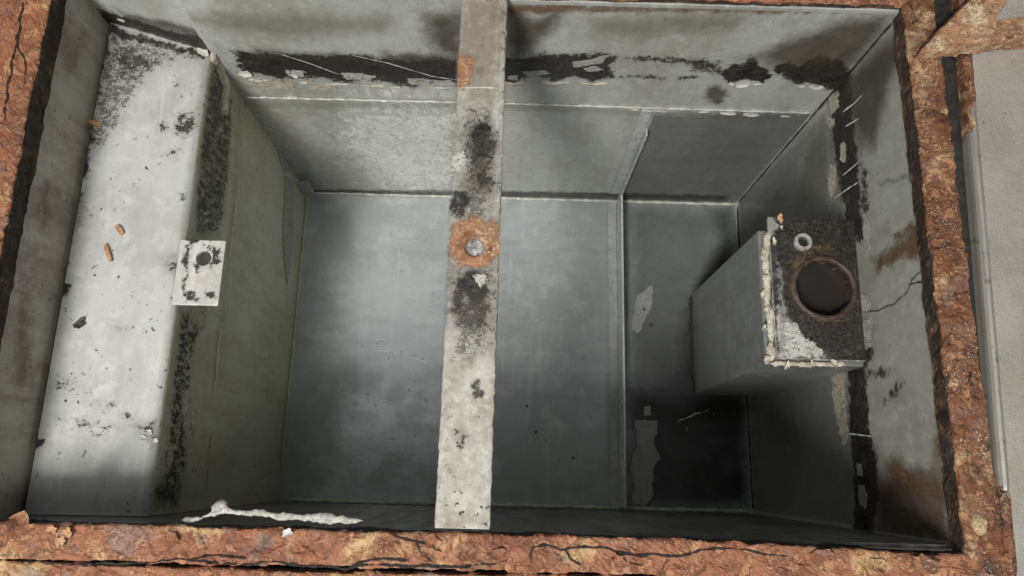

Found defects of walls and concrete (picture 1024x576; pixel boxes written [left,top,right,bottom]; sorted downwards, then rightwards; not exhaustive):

crack [3,1,26,121]
rust [457,55,476,90]
damp [626,54,723,81]
damp [326,103,501,218]
damp [449,271,496,339]
peeling [631,285,653,333]
crack [866,272,922,313]
peeling [760,290,849,445]
peeling [629,406,661,506]
rust [8,510,29,529]
crack [30,531,789,571]
rust [909,553,943,575]